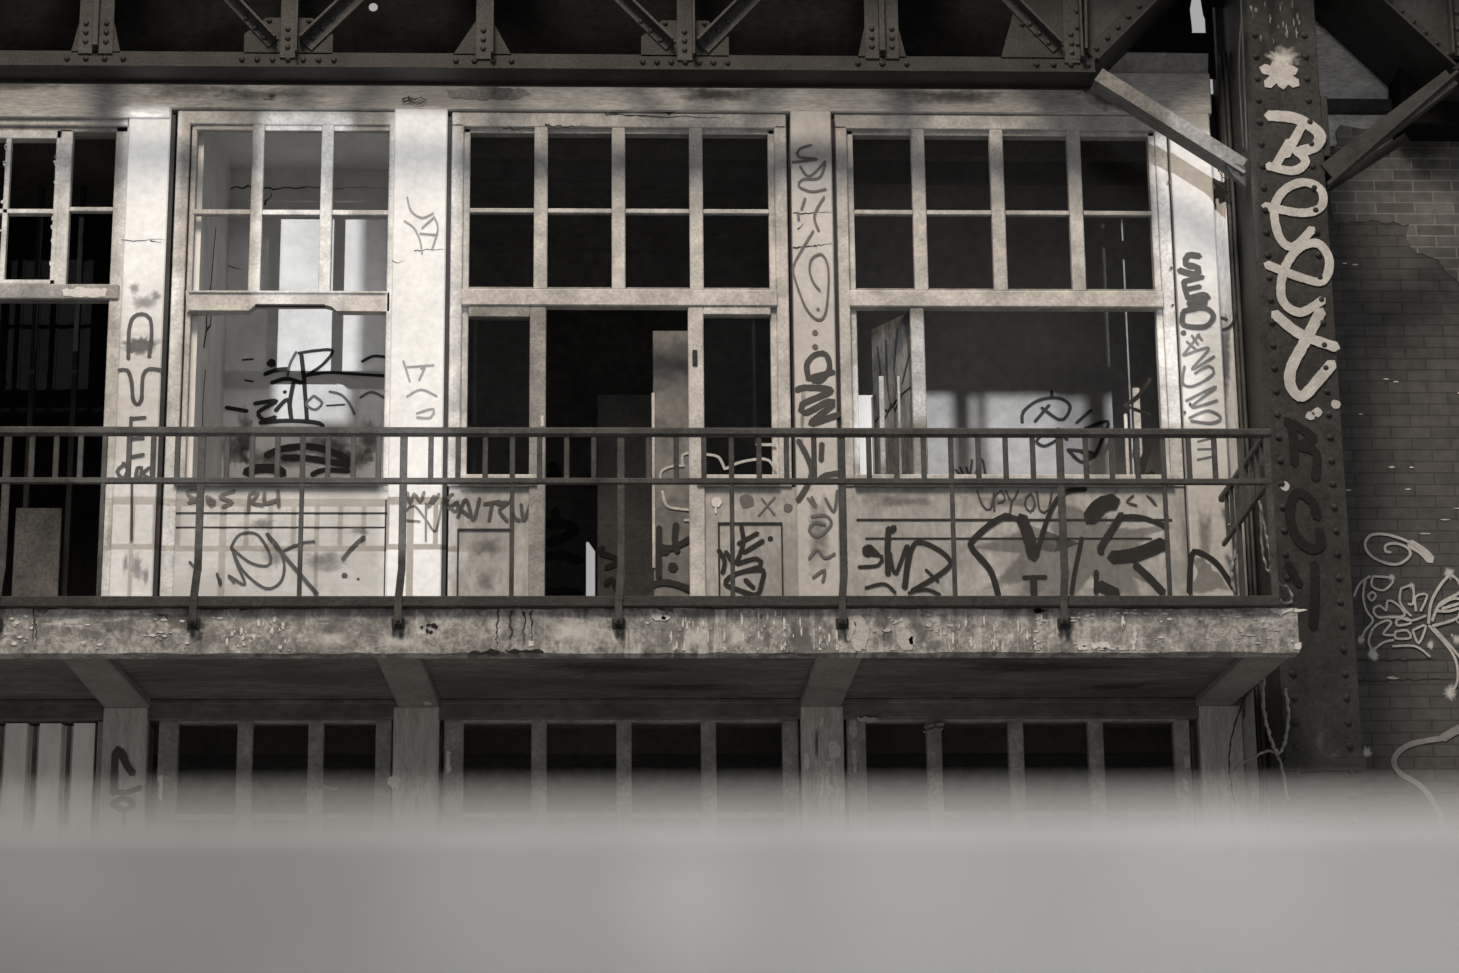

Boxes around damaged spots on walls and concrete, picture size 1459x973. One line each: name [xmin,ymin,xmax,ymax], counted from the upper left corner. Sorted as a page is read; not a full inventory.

peeling [1333,125,1367,154]
peeling [1330,137,1459,283]
peeling [1305,400,1341,420]